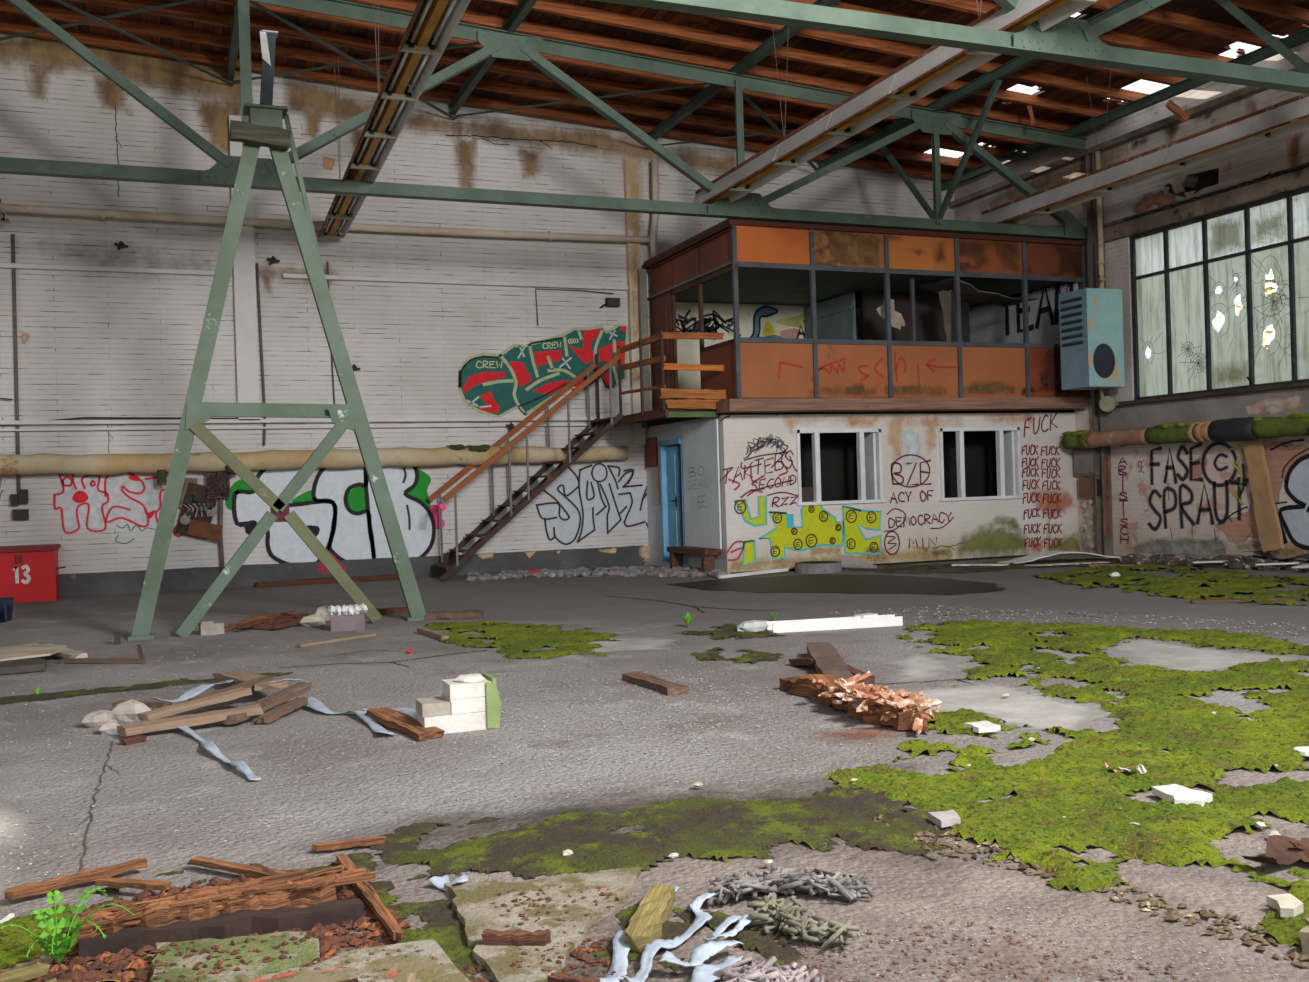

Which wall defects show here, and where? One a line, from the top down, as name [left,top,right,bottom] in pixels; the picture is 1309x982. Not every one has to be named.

water stain [0,35,241,153]
water stain [289,83,375,146]
water stain [407,115,735,281]
crack [78,741,119,872]